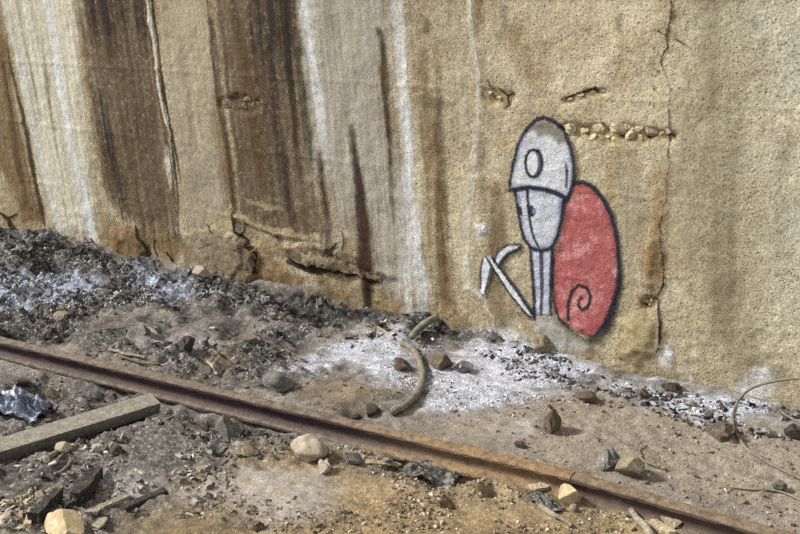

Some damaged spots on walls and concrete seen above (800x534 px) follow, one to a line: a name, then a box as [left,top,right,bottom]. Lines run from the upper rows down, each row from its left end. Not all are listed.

damp [16,50,38,133]
damp [43,0,99,243]
damp [79,0,180,241]
crack [135,225,173,262]
crack [230,213,257,273]
damp [206,0,326,241]
flaking render [184,214,386,284]
corrosion [349,127,372,307]
corrosion [377,29,391,166]
spalling [483,88,515,108]
spalling [562,123,676,144]
crack [648,0,688,353]